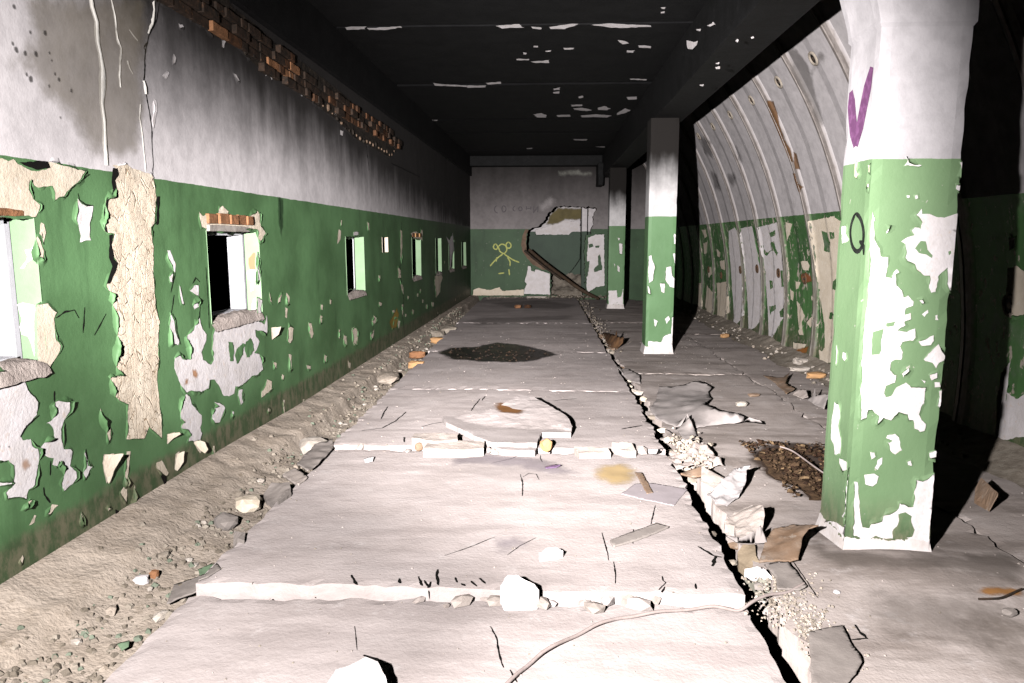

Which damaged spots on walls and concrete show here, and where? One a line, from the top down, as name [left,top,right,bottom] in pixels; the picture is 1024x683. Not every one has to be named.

peeling [594,23,651,53]
crack [143,6,159,225]
rust [767,101,802,192]
crack [72,168,119,284]
peeling [472,220,624,305]
peeling [647,233,676,297]
flaking render [0,155,293,525]
damp [439,343,556,362]
flaking render [647,311,673,348]
peeling [698,193,958,547]
crack [623,425,678,455]
crack [695,546,720,589]